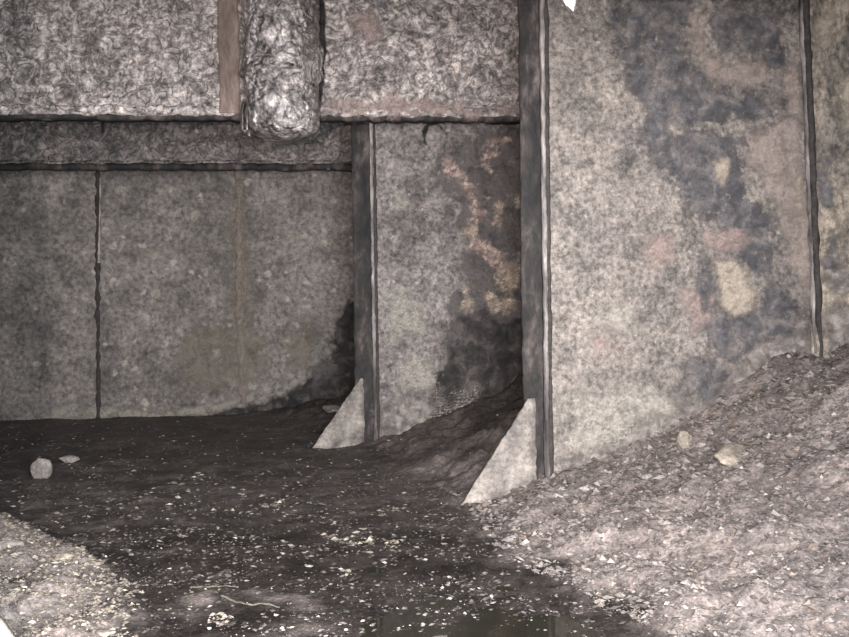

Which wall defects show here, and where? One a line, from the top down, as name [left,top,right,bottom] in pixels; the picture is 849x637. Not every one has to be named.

leakage [379,129,522,436]
leakage [561,0,810,469]